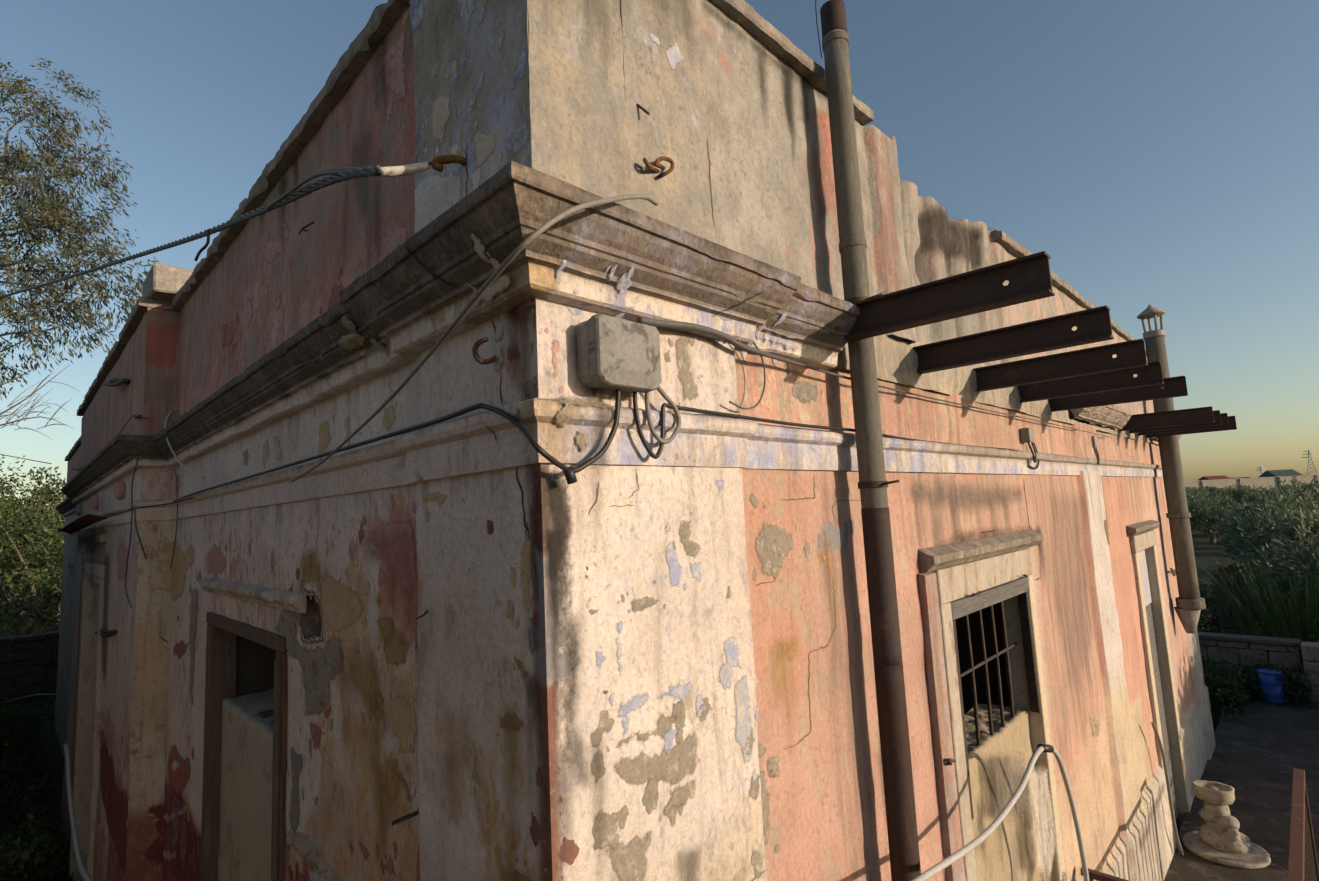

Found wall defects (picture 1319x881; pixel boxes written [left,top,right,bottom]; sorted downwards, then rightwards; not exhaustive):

peeling [373,0,481,265]
leakage [918,208,982,266]
peeling [100,730,128,875]
peeling [132,533,232,706]
flaking render [277,553,352,881]
peeling [507,539,573,680]
leakage [528,476,570,640]
leakage [569,624,579,713]
flaking render [502,682,713,881]
peeling [595,512,707,672]
peeling [719,637,780,878]
flaking render [750,493,825,580]